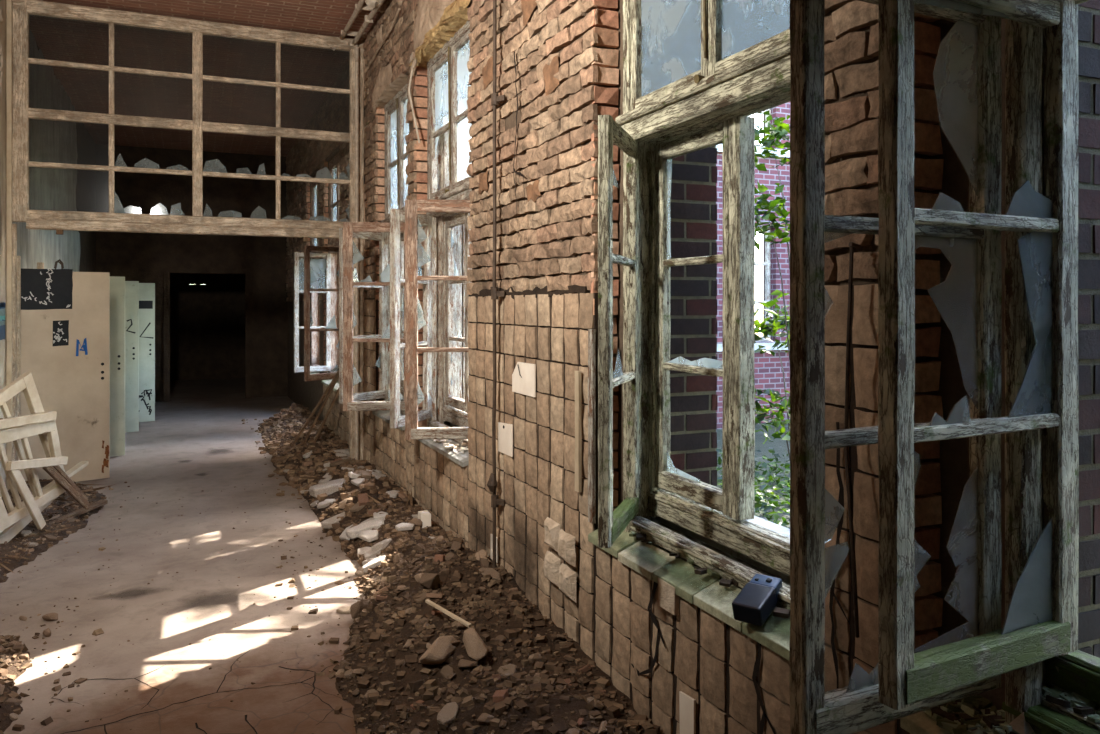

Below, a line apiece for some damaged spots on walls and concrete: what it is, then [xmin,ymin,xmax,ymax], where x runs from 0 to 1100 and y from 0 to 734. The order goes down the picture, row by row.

flaking render [468,285,590,299]
crack [631,582,666,676]
crack [52,645,352,734]
crack [752,643,776,734]